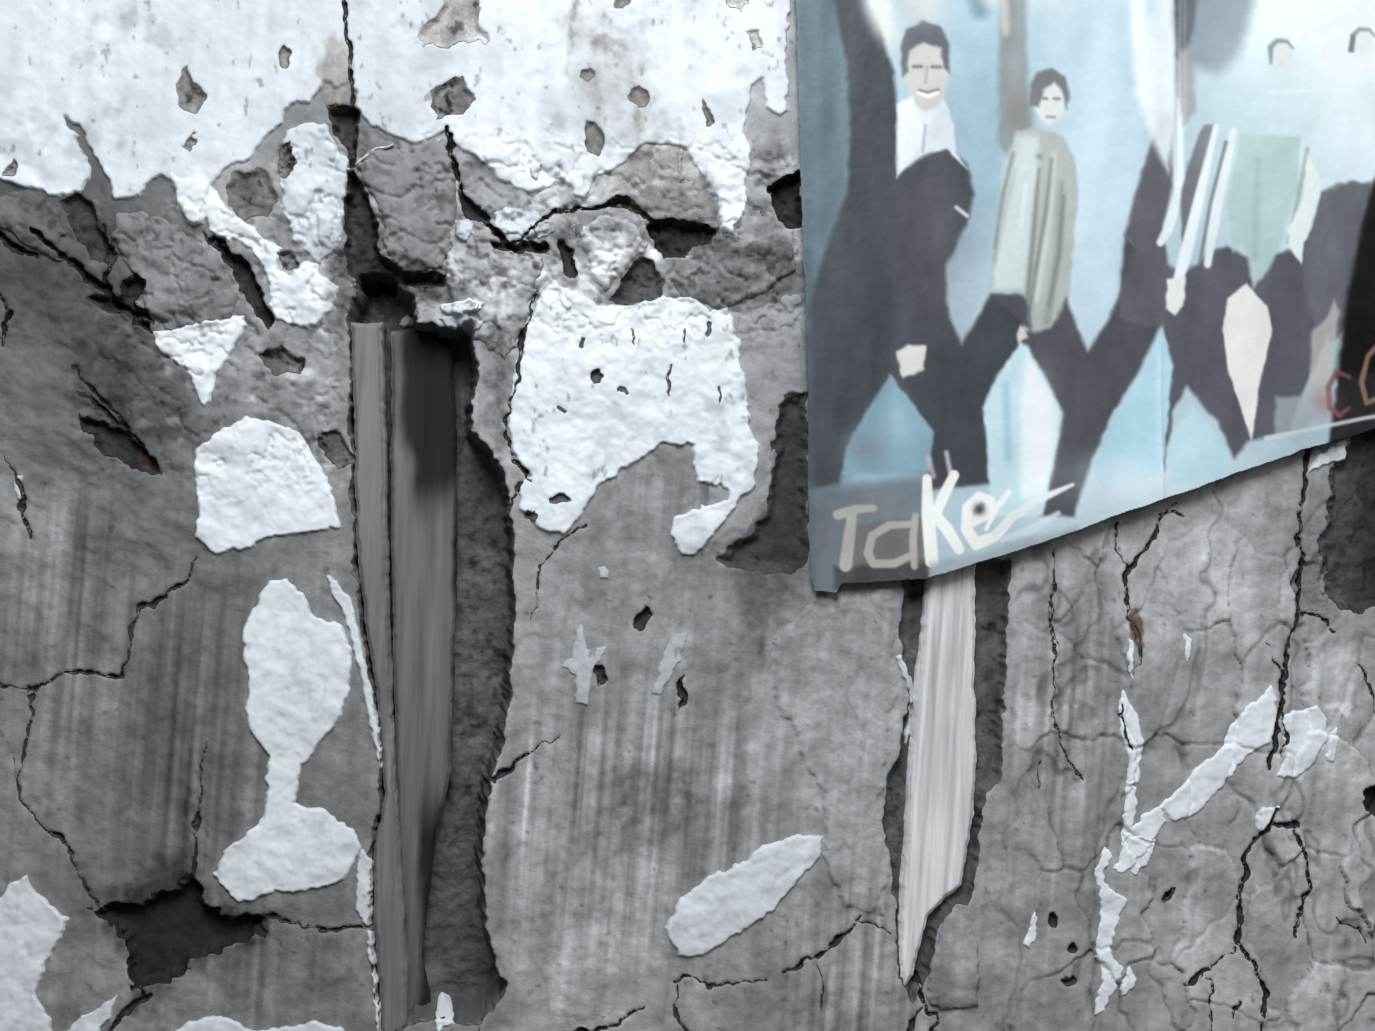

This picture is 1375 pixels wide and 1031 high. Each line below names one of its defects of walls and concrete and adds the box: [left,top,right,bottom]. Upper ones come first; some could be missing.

crack [342,0,359,169]
crack [445,125,661,253]
crack [0,556,197,906]
peeling [0,0,823,1031]
crack [575,915,891,1031]
peeling [1023,912,1058,948]
spalling [1060,976,1077,986]
crack [1114,503,1184,749]
peeling [1183,634,1192,662]
peeling [1094,639,1339,1015]
crack [1184,808,1313,1031]
crack [1266,447,1336,770]